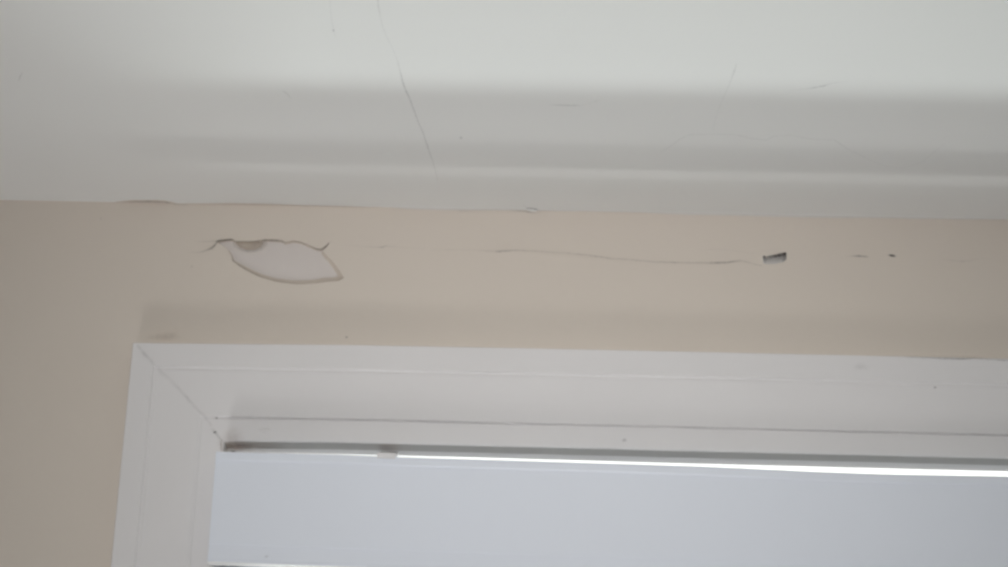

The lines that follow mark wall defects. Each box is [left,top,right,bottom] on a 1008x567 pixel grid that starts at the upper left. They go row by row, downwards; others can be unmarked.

peeling [218,239,344,284]
spalling [763,252,787,264]